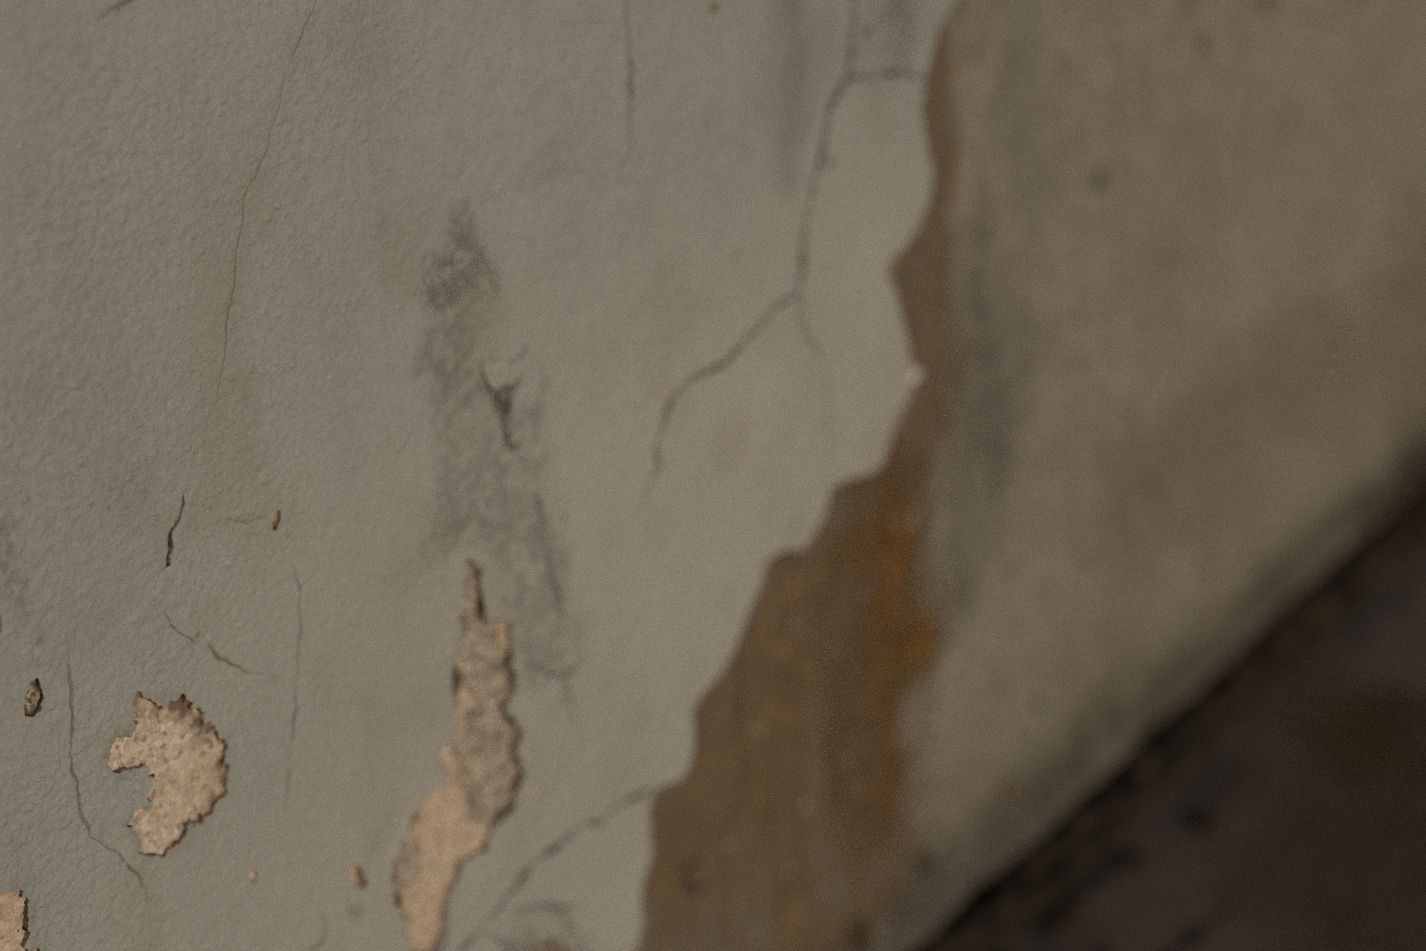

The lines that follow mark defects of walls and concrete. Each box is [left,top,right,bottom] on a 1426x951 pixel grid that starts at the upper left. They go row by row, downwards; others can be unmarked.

peeling [482,344,533,391]
spalling [635,0,1426,951]
crack [122,495,185,629]
peeling [107,691,229,858]
peeling [392,558,525,951]
leakage [646,457,927,951]
peeling [0,890,40,951]